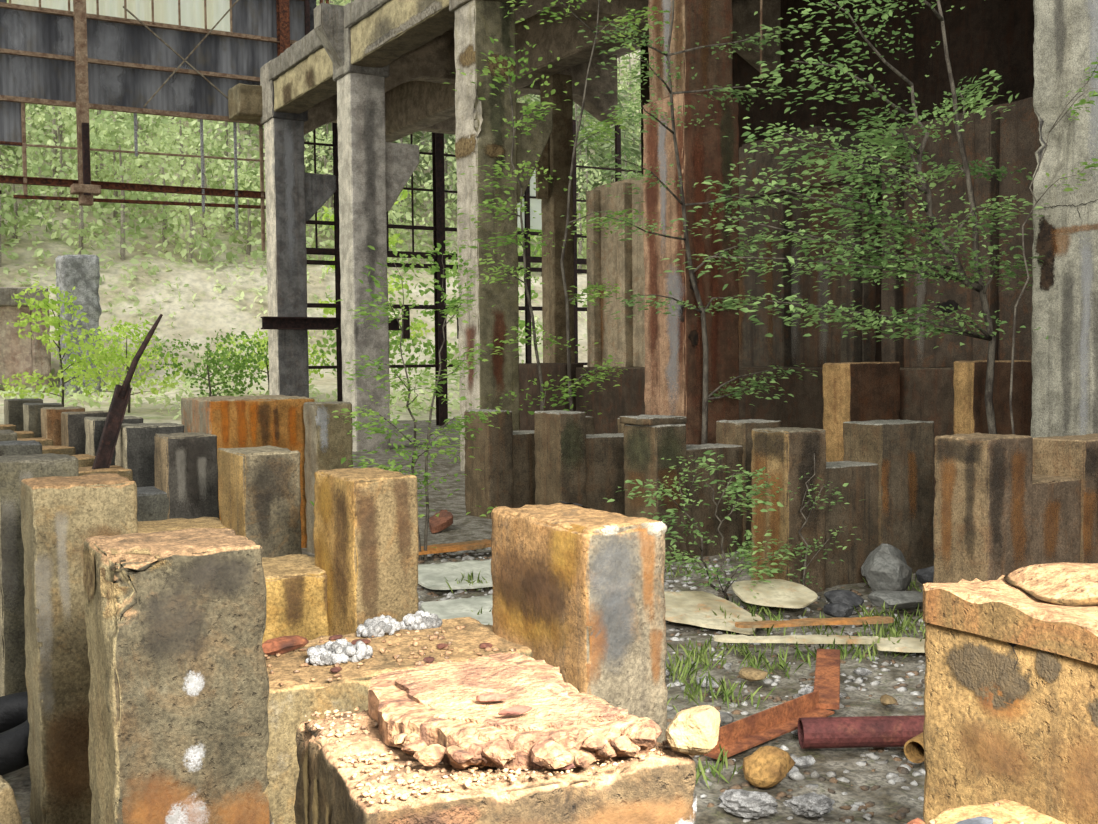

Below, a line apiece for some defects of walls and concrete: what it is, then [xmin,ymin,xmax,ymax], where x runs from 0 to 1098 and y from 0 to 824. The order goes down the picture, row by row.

rust [654,0,662,68]
rust [646,110,658,355]
rust [675,119,720,376]
rust [221,400,258,448]
spalling [83,547,134,619]
water stain [594,544,636,657]
water stain [185,673,204,695]
water stain [186,746,204,771]
water stain [166,794,207,824]